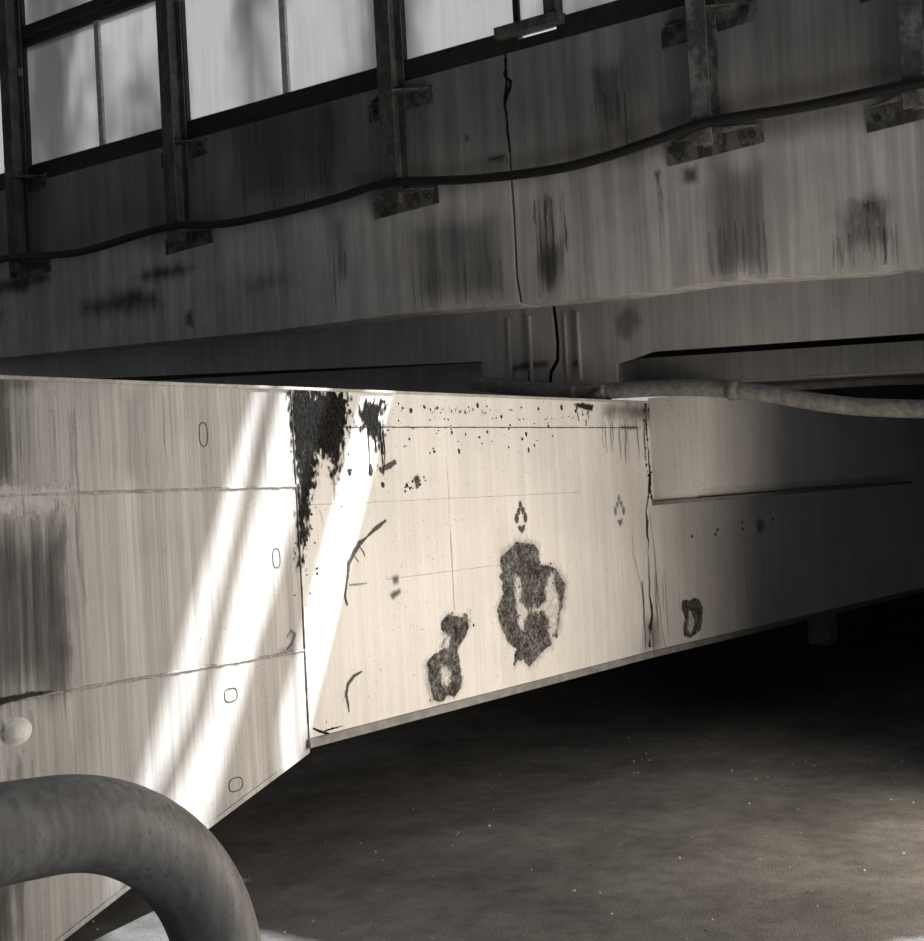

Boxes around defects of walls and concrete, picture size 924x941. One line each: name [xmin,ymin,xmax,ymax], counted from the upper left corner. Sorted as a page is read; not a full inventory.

crack [489,55,512,164]
water stain [0,382,75,518]
water stain [0,530,64,695]
spalling [427,612,475,702]
spalling [497,501,566,667]
spalling [682,598,703,638]